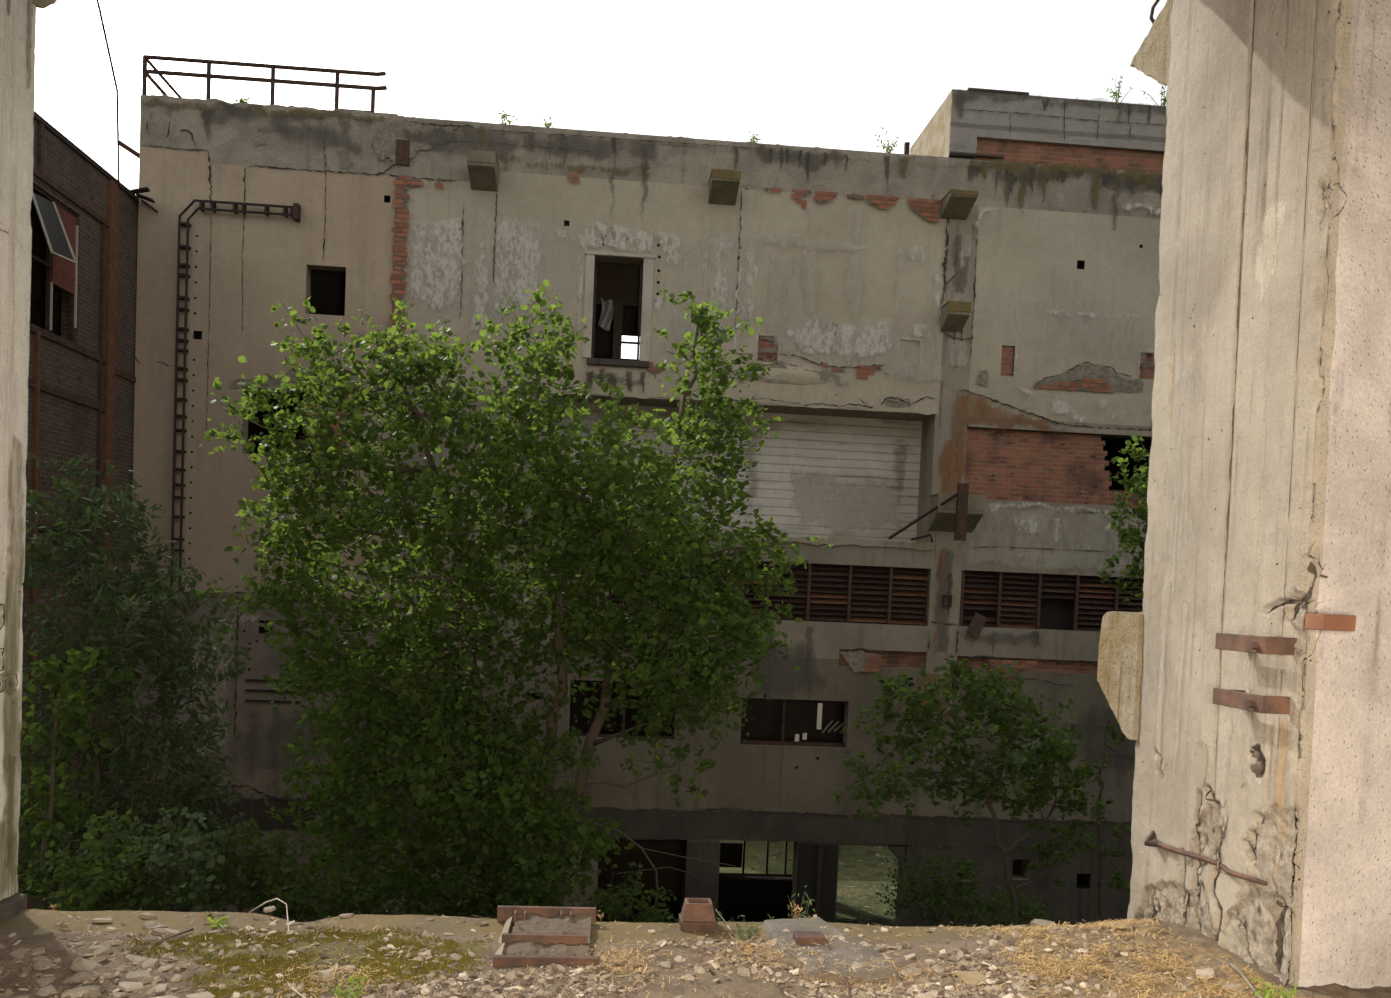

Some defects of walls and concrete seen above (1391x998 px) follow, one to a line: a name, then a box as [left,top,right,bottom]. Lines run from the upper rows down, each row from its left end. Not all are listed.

peeling [372,120,541,332]
peeling [557,221,681,325]
spalling [742,187,942,222]
peeling [701,208,991,387]
damp [968,158,1163,230]
spalling [1014,345,1153,422]
rust [939,393,1057,494]
spalling [841,650,881,673]
spalling [1113,800,1295,985]